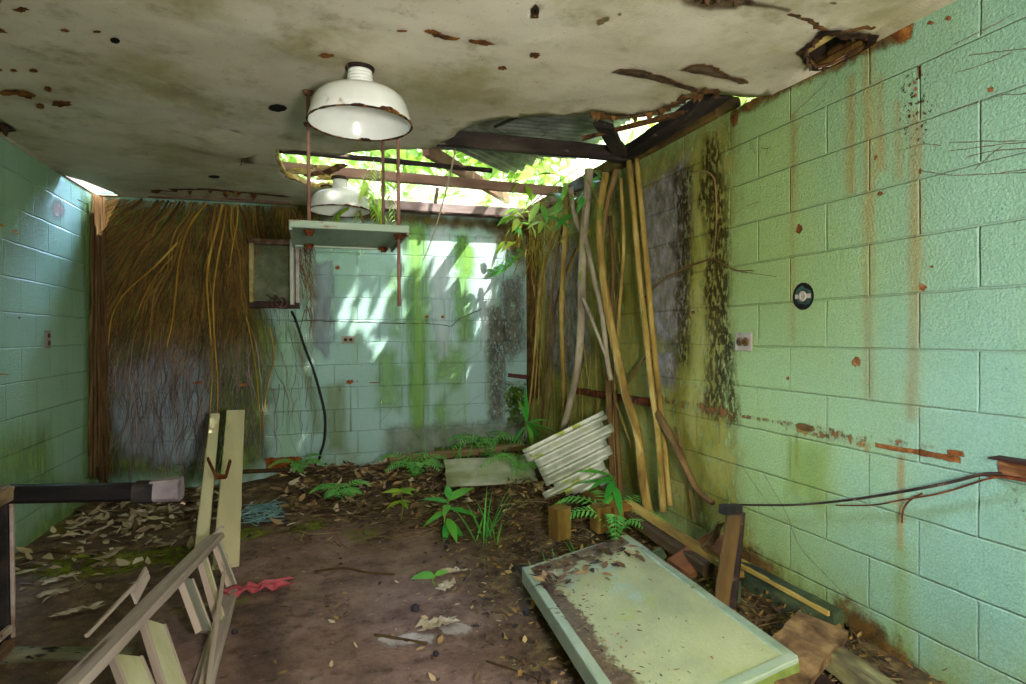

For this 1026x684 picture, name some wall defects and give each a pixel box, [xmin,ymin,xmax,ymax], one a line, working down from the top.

mould [674,137,737,423]
rust [576,388,964,463]